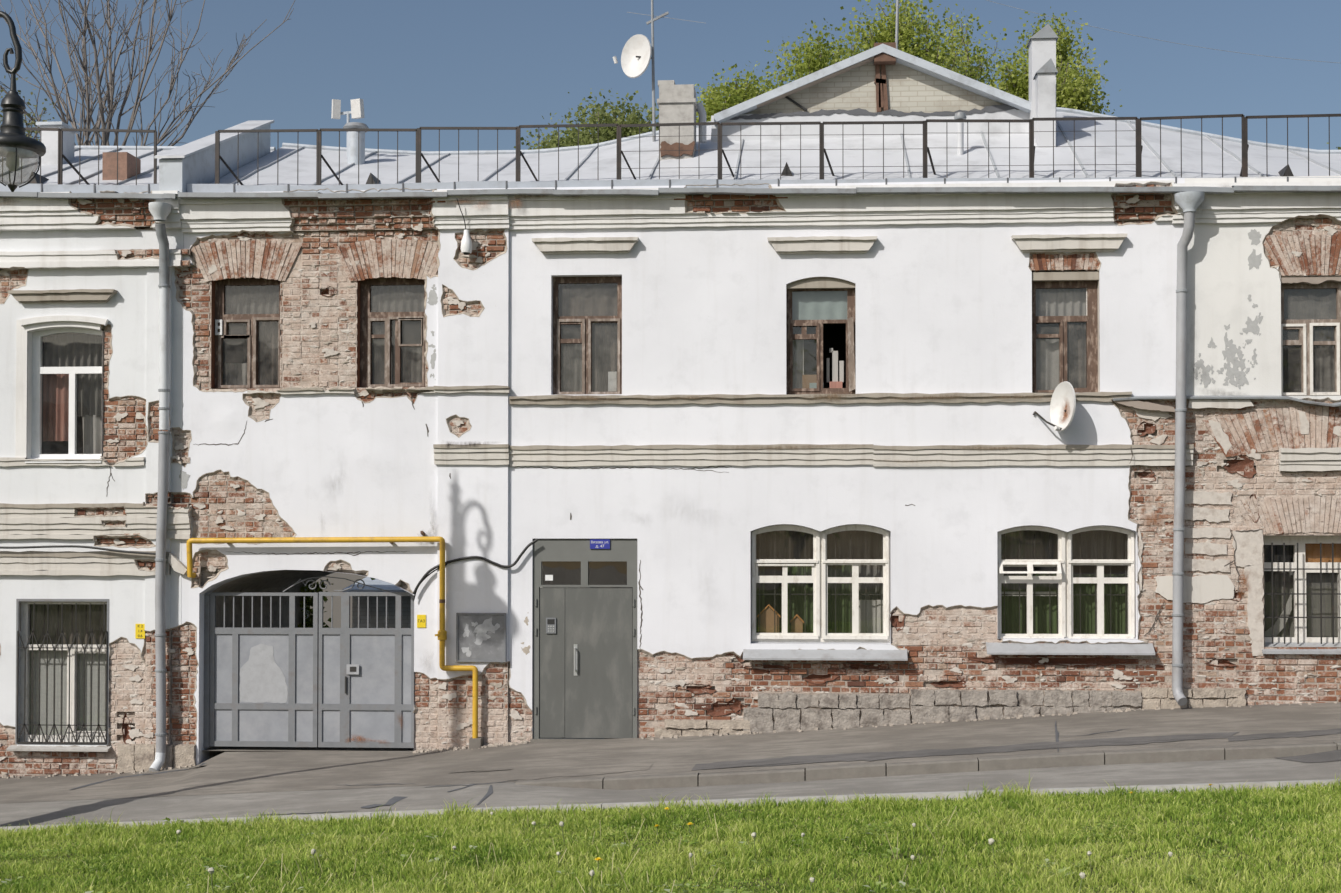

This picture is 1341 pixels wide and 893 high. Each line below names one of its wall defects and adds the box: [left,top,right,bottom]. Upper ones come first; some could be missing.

spalling [68,190,156,230]
spalling [1111,181,1178,226]
spalling [0,266,29,304]
spalling [114,188,507,422]
spalling [1028,252,1101,272]
spalling [1248,214,1341,278]
spalling [100,324,297,588]
spalling [446,414,472,438]
spalling [74,506,156,548]
spalling [638,295,1341,738]
spalling [0,621,199,777]
spalling [413,661,532,750]